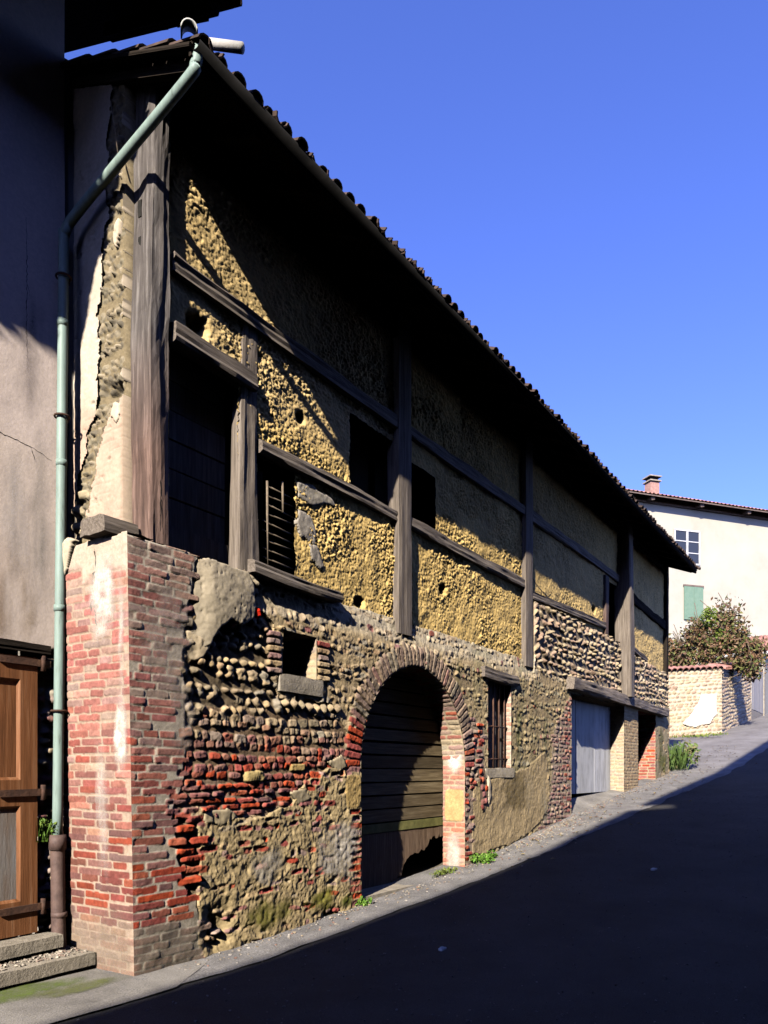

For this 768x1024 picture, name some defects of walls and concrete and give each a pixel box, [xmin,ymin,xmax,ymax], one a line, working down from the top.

spalling [62,85,136,575]
spalling [194,609,350,827]